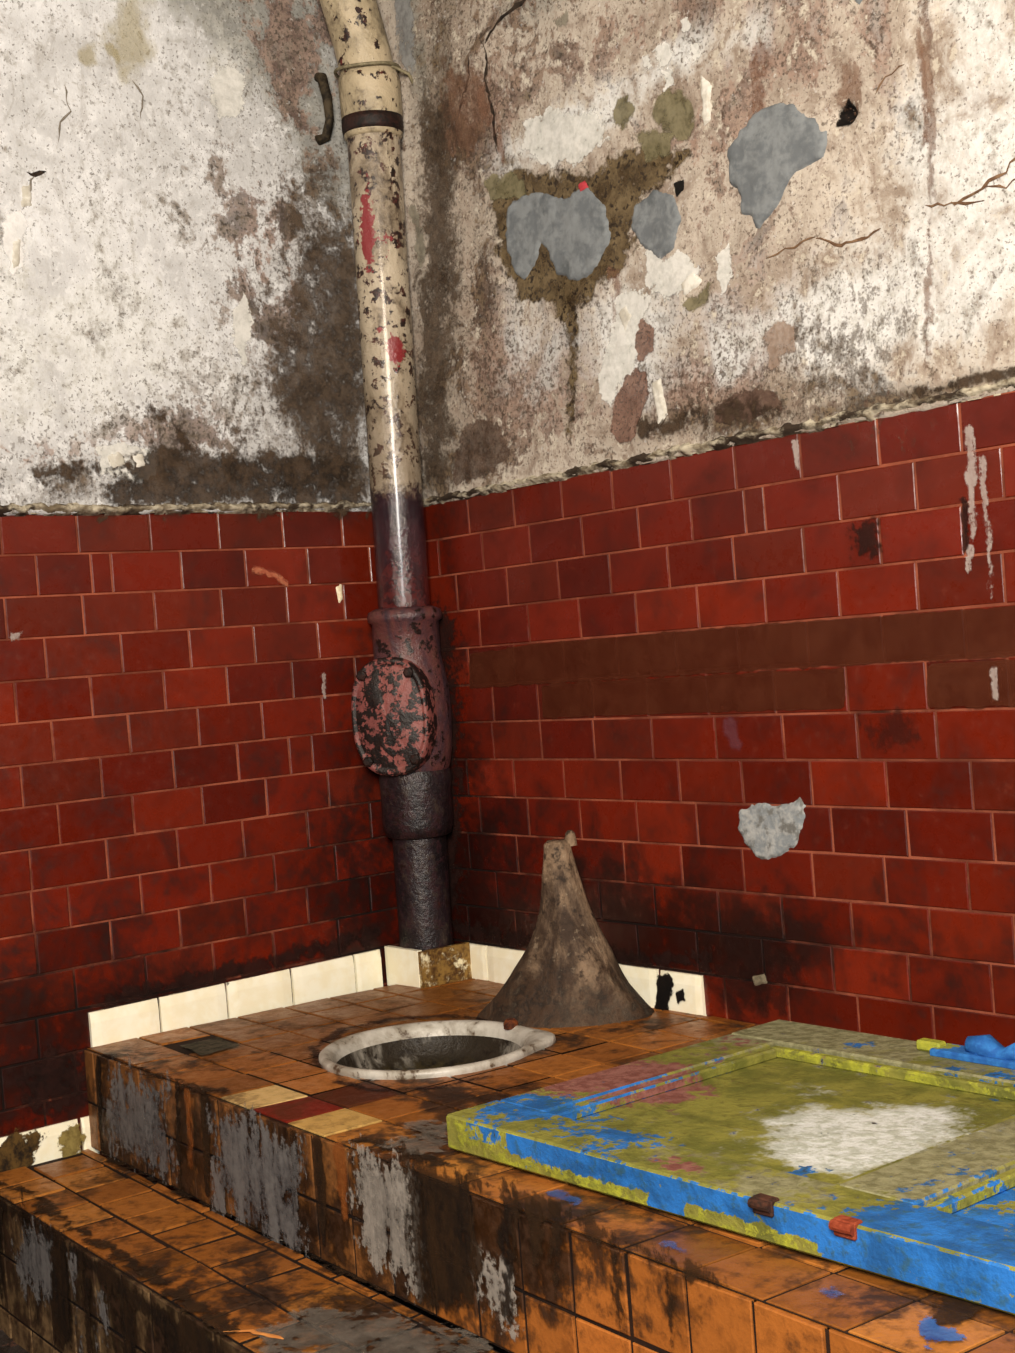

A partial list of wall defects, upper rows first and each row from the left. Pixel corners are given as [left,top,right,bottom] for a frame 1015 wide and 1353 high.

crack [454,0,526,154]
damp [32,209,371,523]
damp [408,99,463,489]
damp [492,106,701,439]
damp [715,243,733,295]
damp [960,456,993,574]
damp [96,1056,178,1184]
damp [201,1090,326,1258]
damp [333,1076,488,1091]